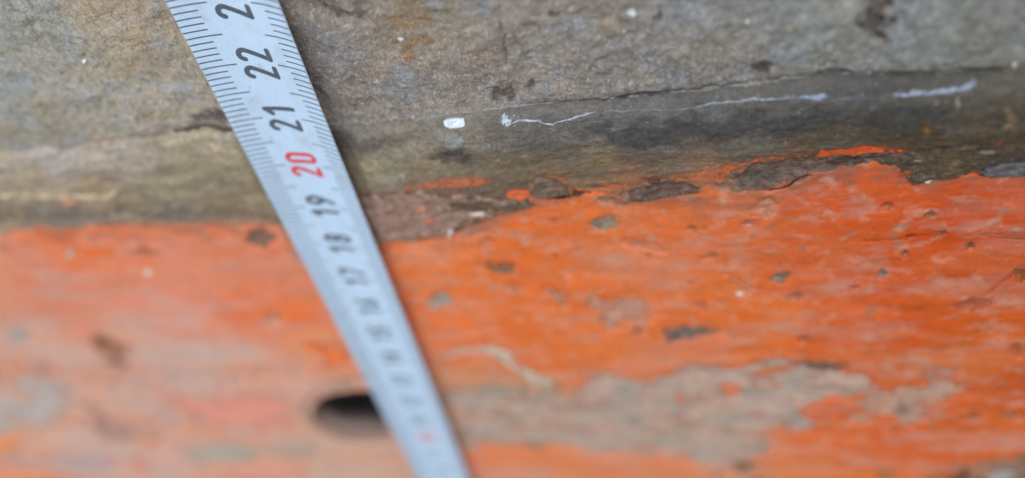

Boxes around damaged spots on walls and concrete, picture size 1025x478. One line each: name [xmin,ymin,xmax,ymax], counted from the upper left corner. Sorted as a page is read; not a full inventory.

peeling [967,161,1025,179]
spalling [357,146,916,244]
peeling [485,262,515,274]
peeling [768,272,790,283]
peeling [425,292,452,308]
peeling [588,298,649,334]
peeling [663,326,719,343]
peeling [433,346,980,473]
spalling [931,454,1025,478]